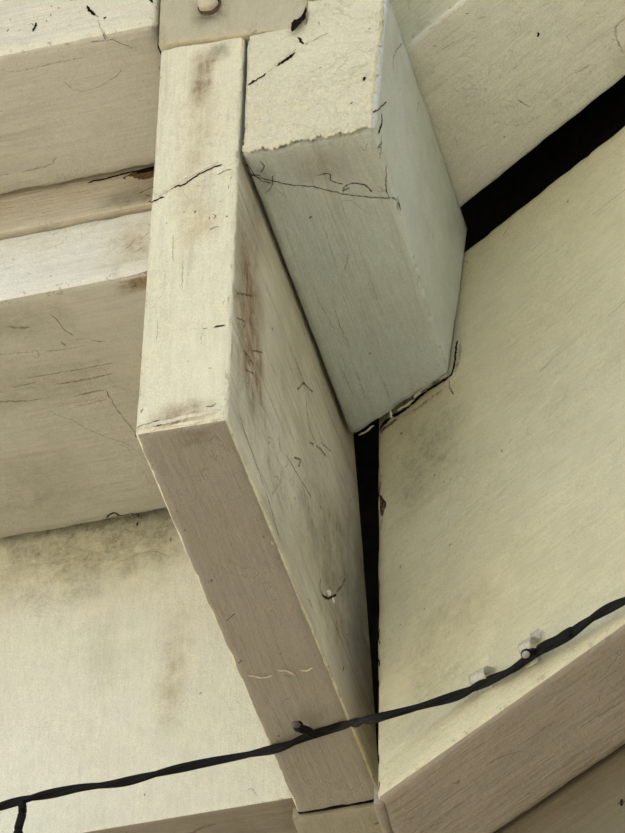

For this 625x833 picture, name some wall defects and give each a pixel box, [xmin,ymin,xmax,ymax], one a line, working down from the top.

peeling [291,5,307,44]
crack [372,102,386,154]
crack [149,161,401,209]